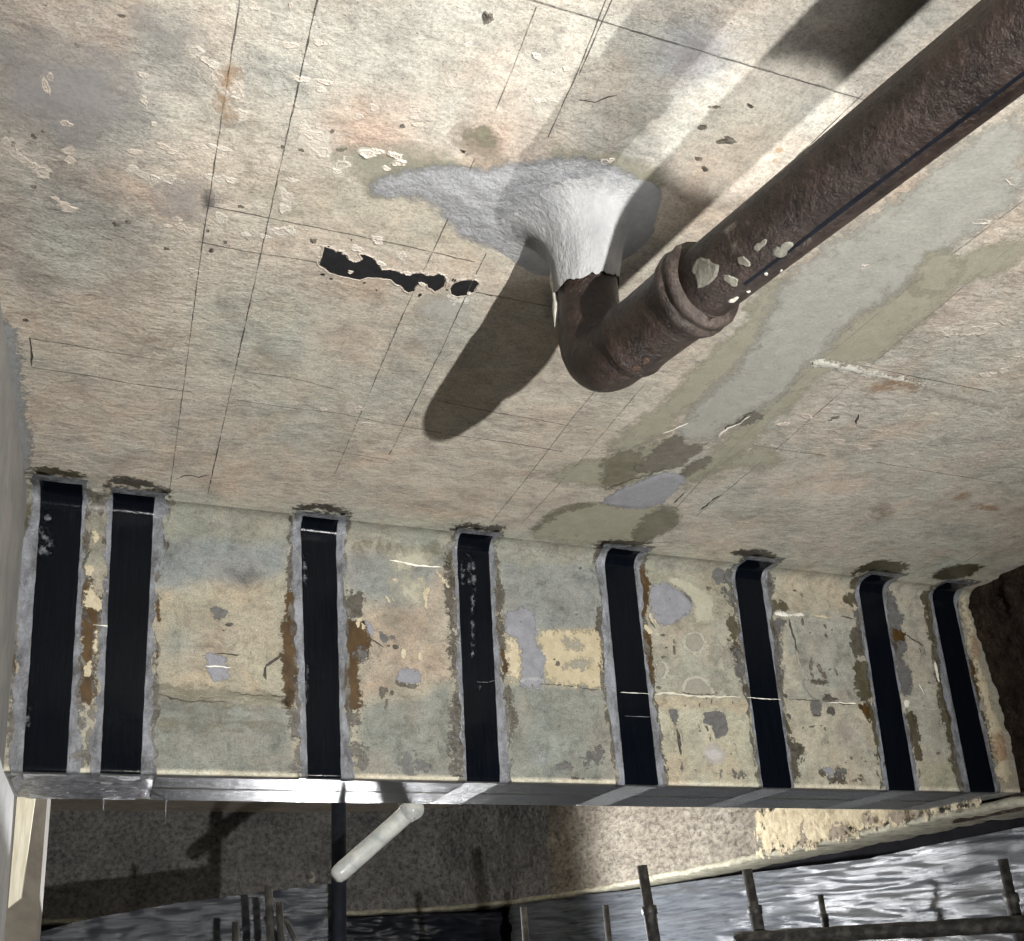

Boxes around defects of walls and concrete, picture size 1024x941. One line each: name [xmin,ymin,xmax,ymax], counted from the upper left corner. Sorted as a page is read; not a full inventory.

peeling [310,234,482,320]
leakage [552,241,1024,490]
leakage [532,503,680,571]
rust [69,576,102,768]
rust [278,529,301,744]
rust [344,589,372,770]
peeling [504,636,523,684]
peeling [537,625,604,690]
leakage [595,607,603,640]
crack [656,691,739,699]
peeling [753,799,982,859]